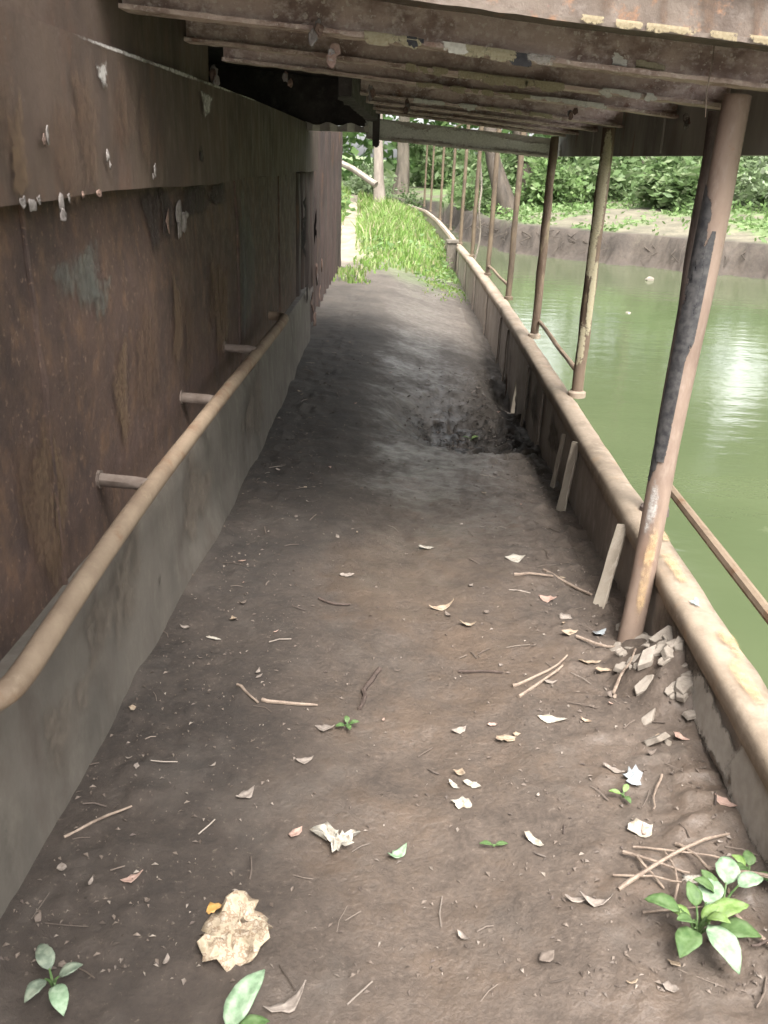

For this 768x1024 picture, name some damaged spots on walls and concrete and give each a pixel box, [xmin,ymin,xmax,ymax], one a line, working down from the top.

peeling [581,14,697,35]
peeling [364,30,424,49]
peeling [710,30,768,45]
peeling [612,52,666,71]
peeling [19,195,41,212]
peeling [58,189,102,222]
peeling [165,200,189,240]
corrosion [644,488,685,579]